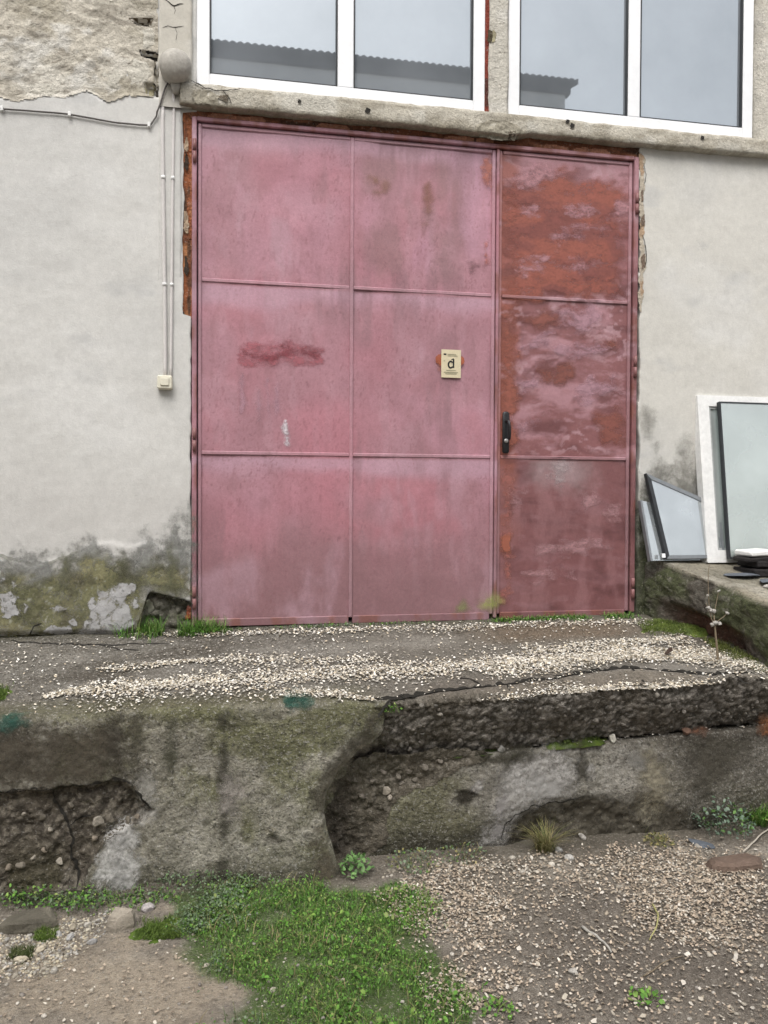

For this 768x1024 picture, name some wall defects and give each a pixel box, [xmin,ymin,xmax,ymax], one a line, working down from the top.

flaking render [0,0,159,102]
damp [0,507,195,595]
flaking render [0,578,28,619]
flaking render [44,583,195,635]
crack [374,665,766,718]
spalling [0,777,151,894]